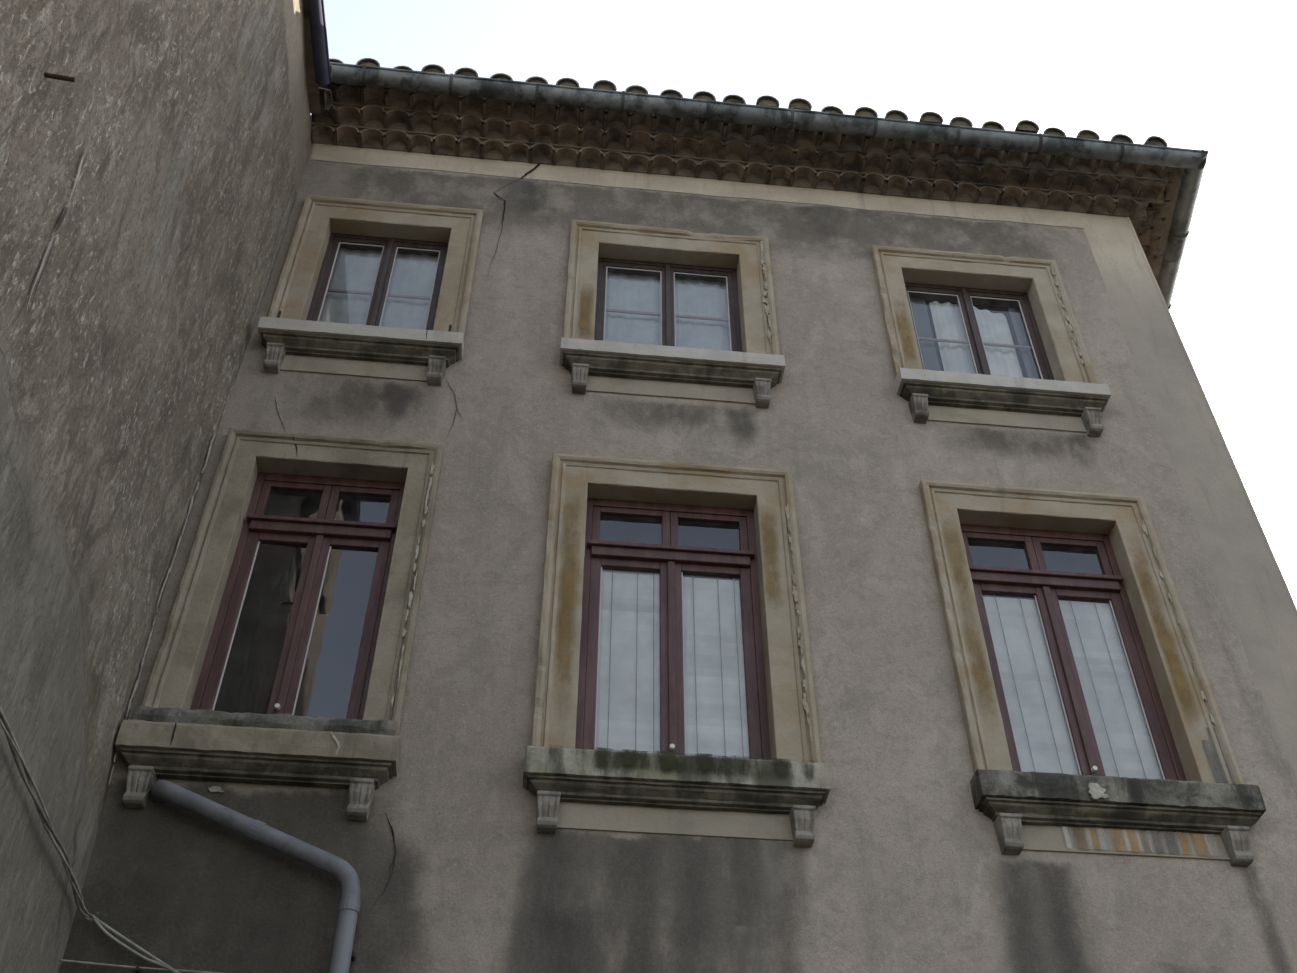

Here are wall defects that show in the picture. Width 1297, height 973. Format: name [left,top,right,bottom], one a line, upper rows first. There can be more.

crack [488,163,541,275]
damp [596,747,635,767]
damp [774,758,788,776]
crack [371,813,397,910]